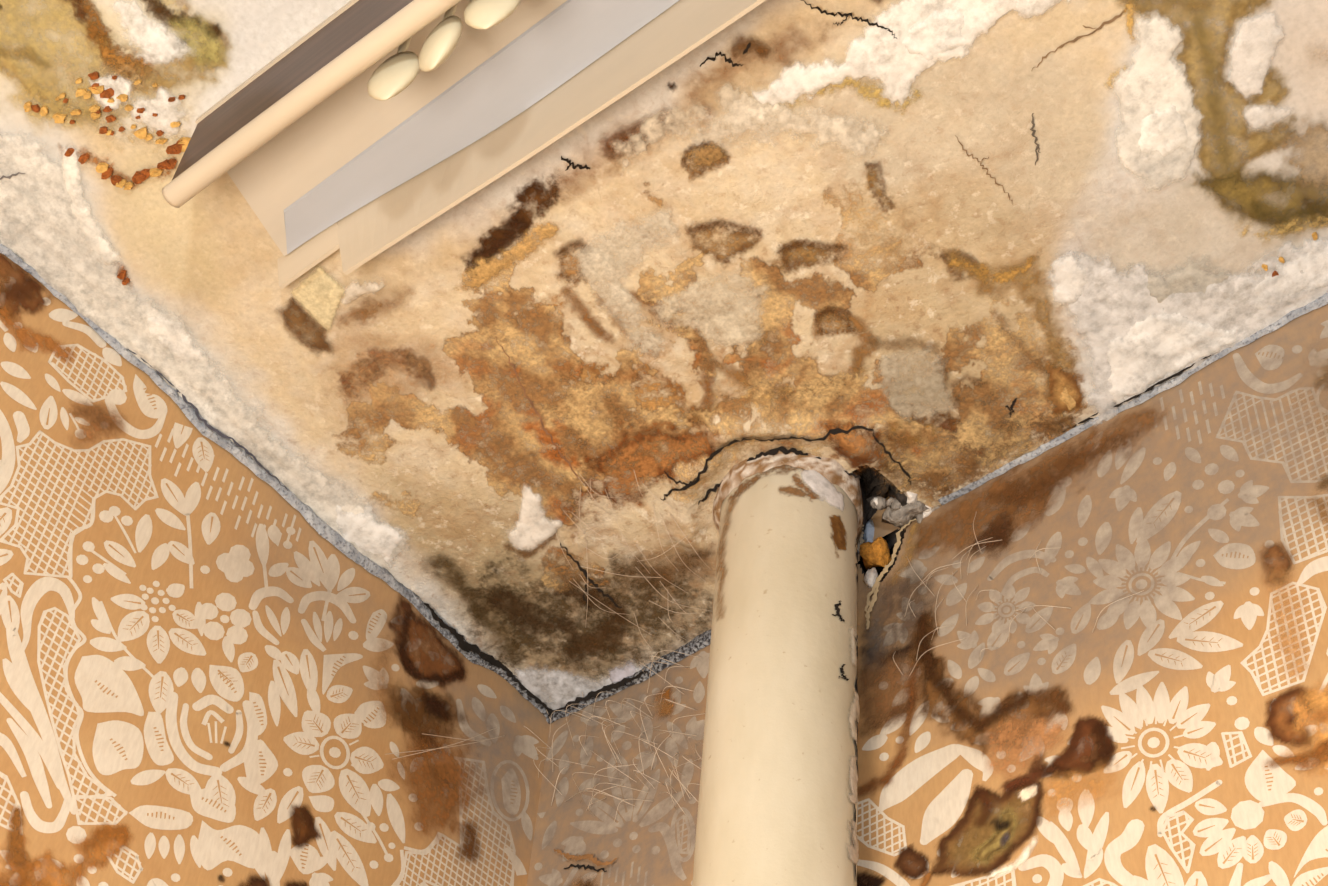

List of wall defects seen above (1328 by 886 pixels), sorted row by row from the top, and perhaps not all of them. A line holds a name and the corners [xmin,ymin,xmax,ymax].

corrosion [23,64,191,190]
damp [0,0,227,124]
peeling [613,0,1070,167]
peeling [1108,15,1202,189]
damp [1120,0,1328,240]
peeling [1228,13,1291,128]
peeling [1050,240,1328,424]
damp [337,164,1156,886]
crack [661,426,911,505]
damp [1265,614,1328,768]
damp [0,809,129,886]
damp [291,806,320,847]